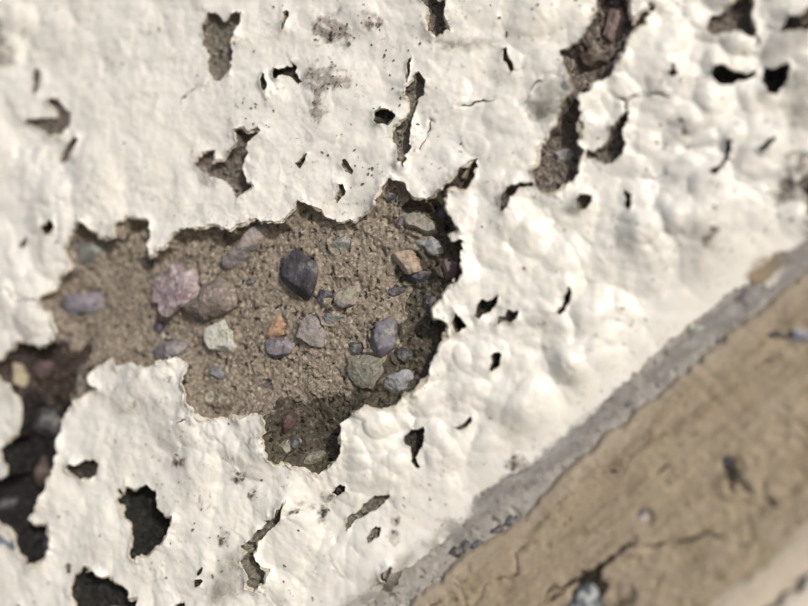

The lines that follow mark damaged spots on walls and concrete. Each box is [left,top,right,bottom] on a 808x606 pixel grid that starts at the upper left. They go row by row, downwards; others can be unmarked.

peeling [201,11,241,81]
peeling [499,0,656,211]
peeling [706,0,758,38]
peeling [711,61,791,95]
peeling [778,6,808,33]
peeling [771,151,808,216]
peeling [0,56,478,567]
peeling [367,239,808,606]
peeling [64,563,138,606]
peeling [238,500,300,592]
crack [455,537,533,606]
crack [538,522,755,606]